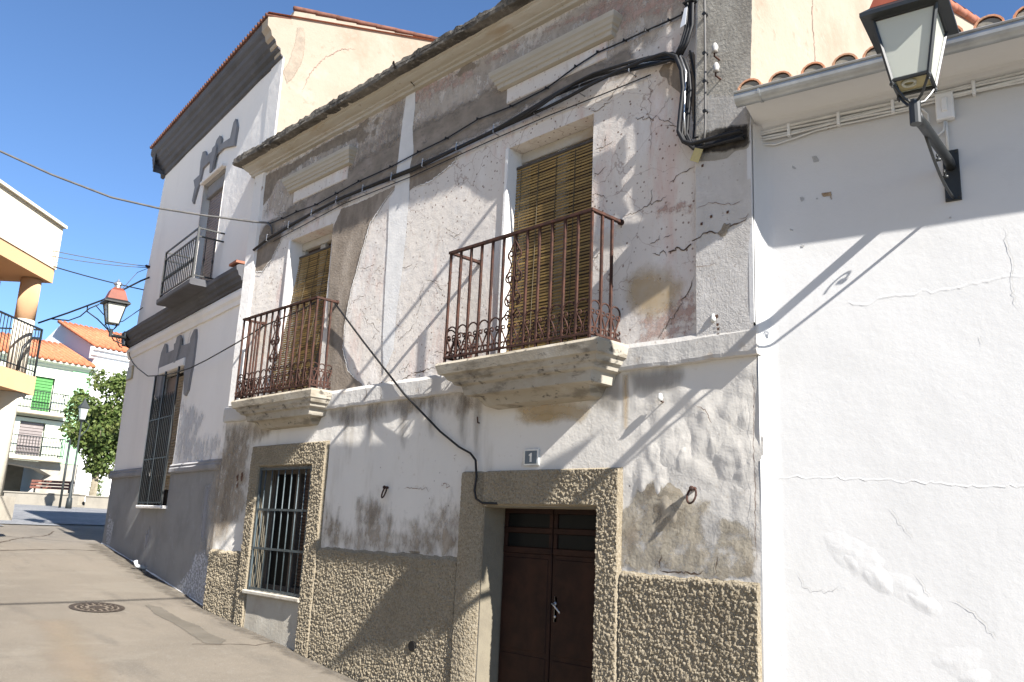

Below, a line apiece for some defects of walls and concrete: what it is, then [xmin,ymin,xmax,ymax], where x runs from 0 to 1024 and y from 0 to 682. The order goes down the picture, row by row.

crack [637,76,676,148]
damp [325,507,458,555]